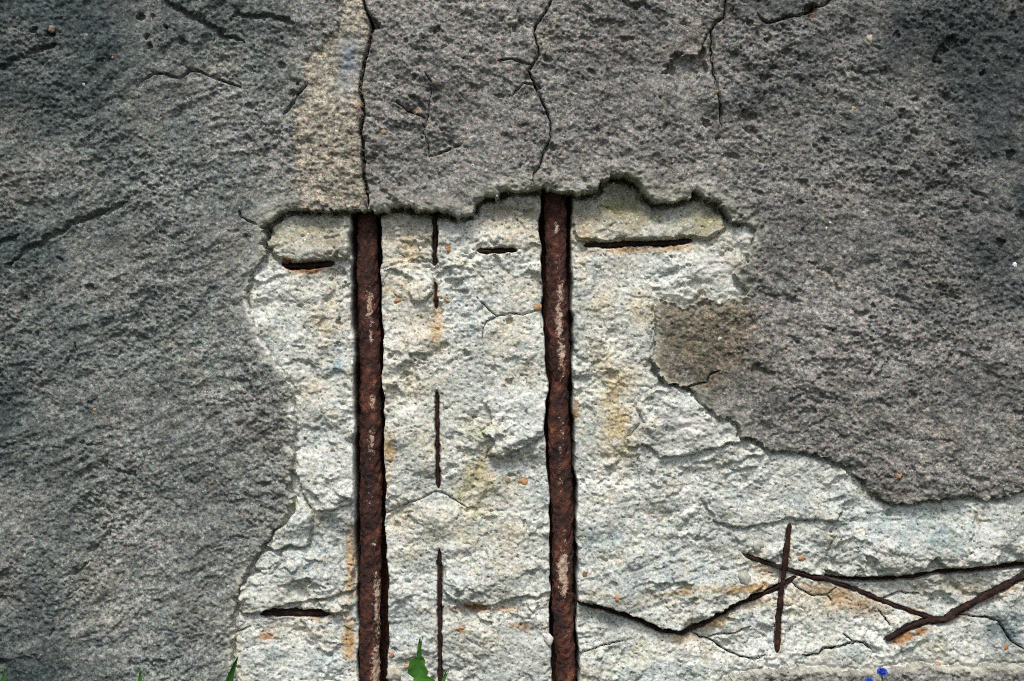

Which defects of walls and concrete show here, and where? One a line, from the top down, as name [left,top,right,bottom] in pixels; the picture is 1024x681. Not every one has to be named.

crack [142,71,239,87]
crack [359,0,374,209]
crack [498,0,553,184]
crack [702,0,727,126]
spalling [225,0,1024,681]
crack [690,626,765,659]
crack [802,634,870,657]
crack [951,611,1024,649]